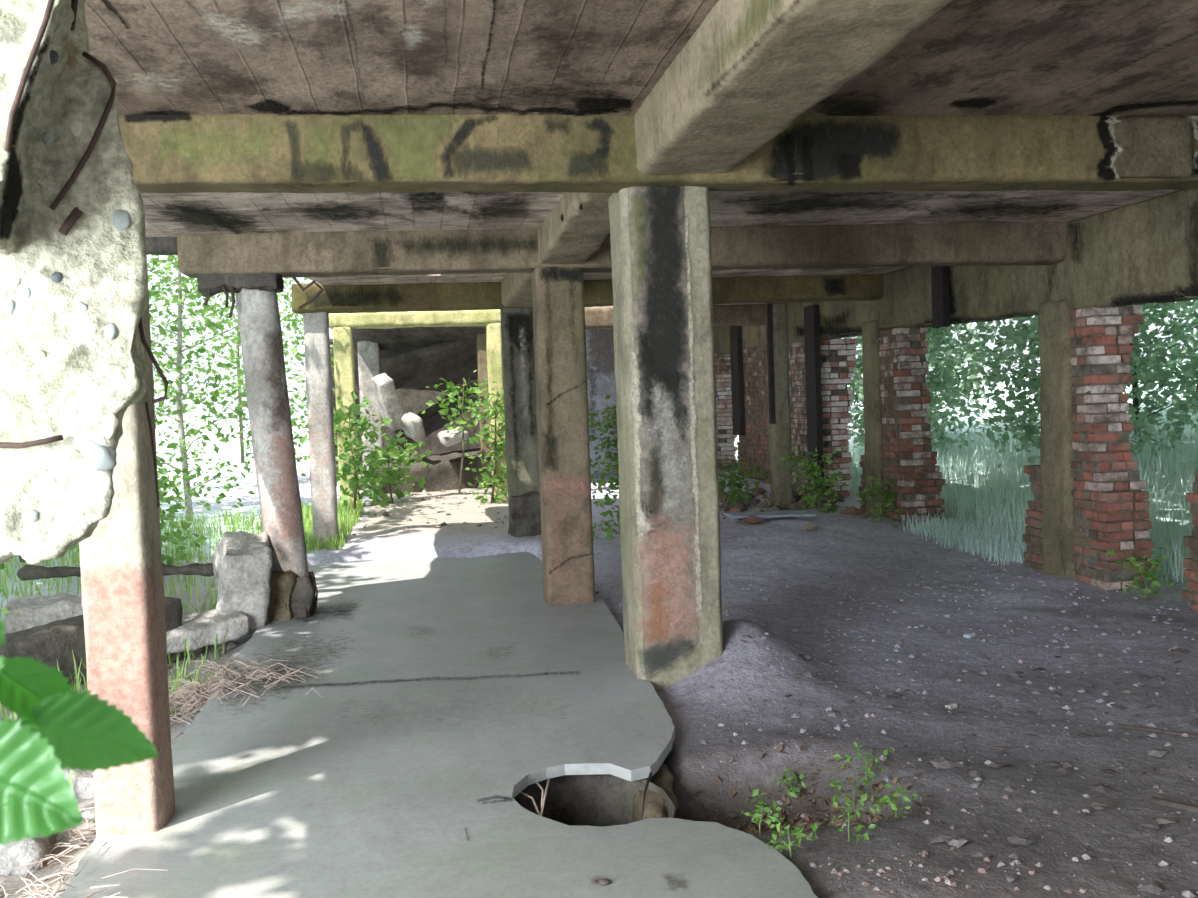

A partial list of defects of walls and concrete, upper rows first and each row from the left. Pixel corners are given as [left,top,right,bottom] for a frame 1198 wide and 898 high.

water stain [388,32,442,75]
crack [0,37,50,240]
water stain [285,122,391,185]
water stain [156,191,526,234]
water stain [442,83,617,176]
water stain [721,92,1080,263]
spalling [0,0,169,565]
water stain [639,186,686,438]
water stain [650,447,661,514]
spalling [632,764,677,823]